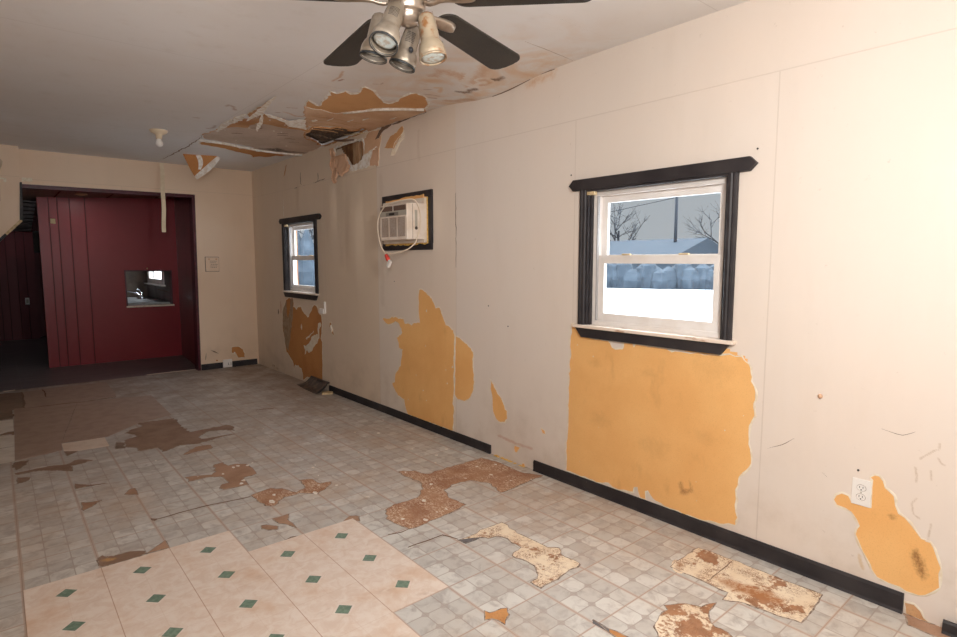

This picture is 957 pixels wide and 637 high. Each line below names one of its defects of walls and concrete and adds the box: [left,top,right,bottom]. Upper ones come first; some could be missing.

peeling [303,86,430,152]
peeling [282,297,335,380]
peeling [382,288,475,431]
peeling [114,418,235,455]
peeling [490,380,507,423]
peeling [565,323,758,526]
peeling [185,462,332,531]
peeling [385,444,543,529]
peeling [458,522,581,589]
peeling [592,619,628,637]
peeling [653,547,823,637]
peeling [833,474,949,637]